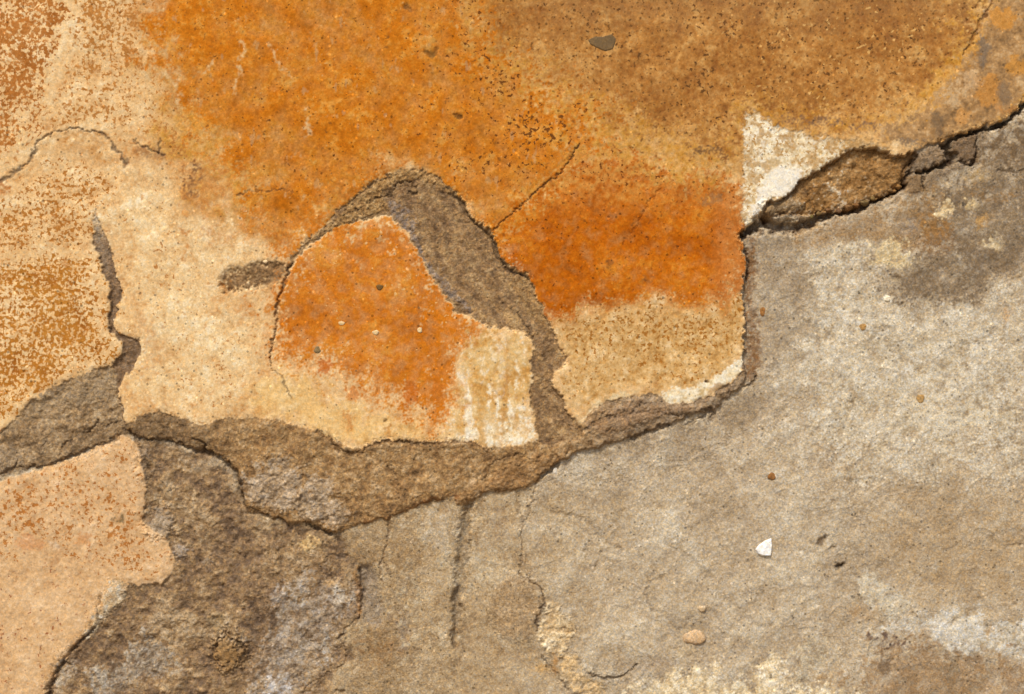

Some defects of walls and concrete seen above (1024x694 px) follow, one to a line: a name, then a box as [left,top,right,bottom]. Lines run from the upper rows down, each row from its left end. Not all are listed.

crack [0,124,170,189]
peeling [0,166,744,476]
corrosion [0,0,763,442]
crack [334,138,585,343]
peeling [738,106,983,222]
crack [734,93,1024,285]
spalling [60,441,354,694]
crack [442,495,485,654]